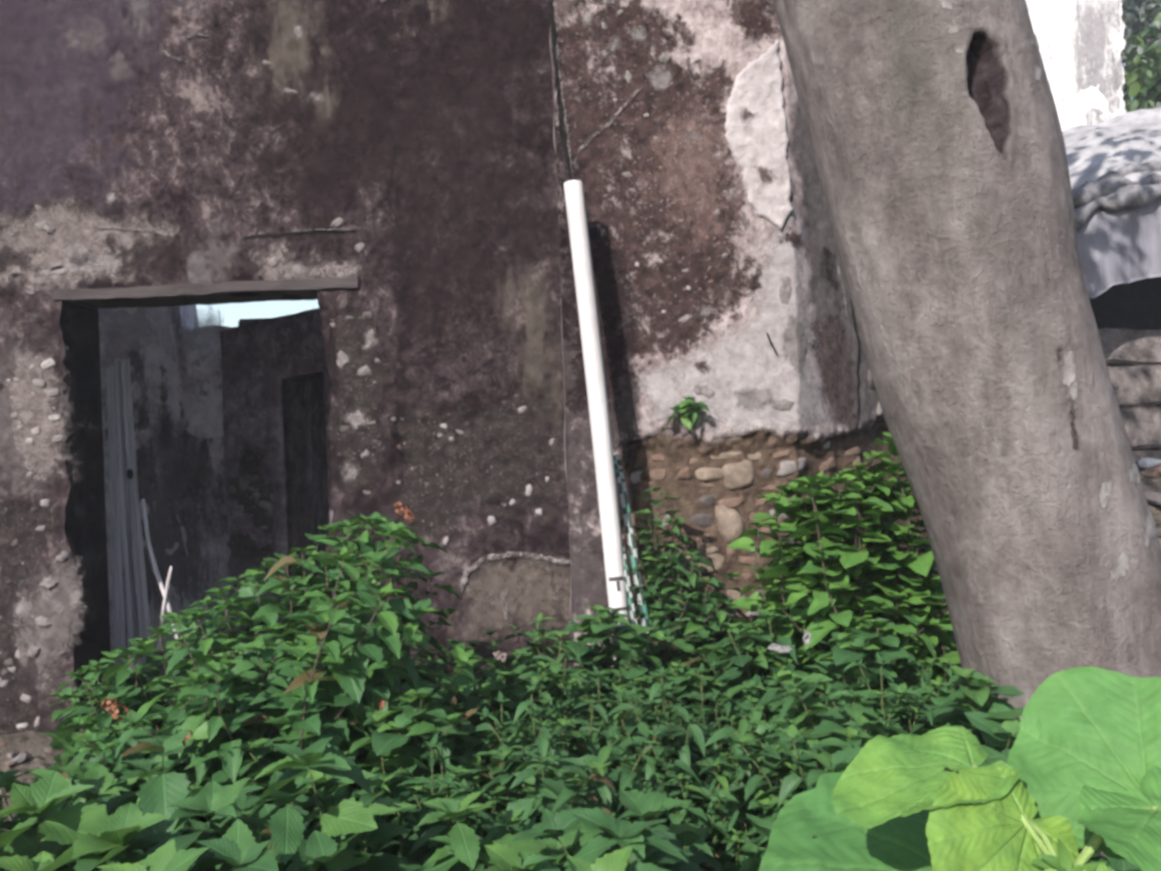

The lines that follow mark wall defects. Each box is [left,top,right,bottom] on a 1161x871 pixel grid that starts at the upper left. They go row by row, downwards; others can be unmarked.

spalling [0,345,86,736]
spalling [0,198,183,295]
damp [105,307,229,633]
damp [159,0,763,635]
flaking render [724,39,802,248]
crack [851,300,861,426]